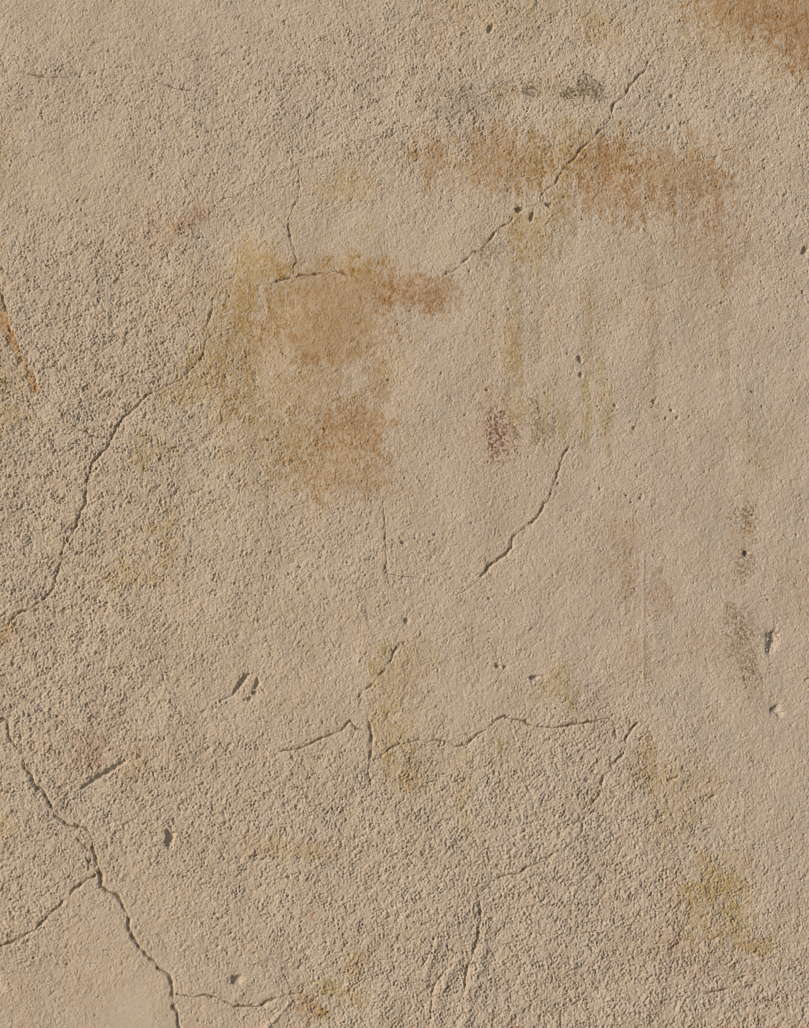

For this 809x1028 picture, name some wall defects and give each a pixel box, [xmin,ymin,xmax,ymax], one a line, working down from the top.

crack [268,167,347,285]
crack [442,58,648,277]
crack [0,277,232,632]
crack [458,444,570,594]
crack [0,718,286,1028]
crack [279,641,641,1023]